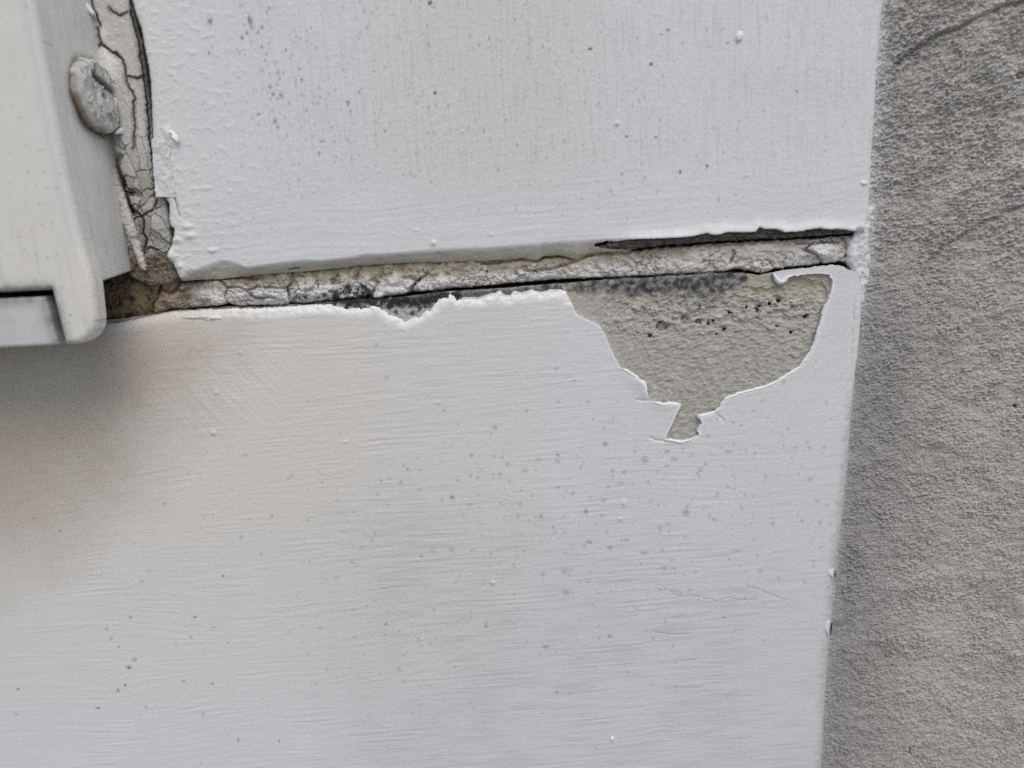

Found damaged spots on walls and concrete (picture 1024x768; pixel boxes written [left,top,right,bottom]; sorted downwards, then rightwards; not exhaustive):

crack [91,0,180,250]
peeling [333,292,462,322]
crack [152,232,854,312]
peeling [561,272,831,444]